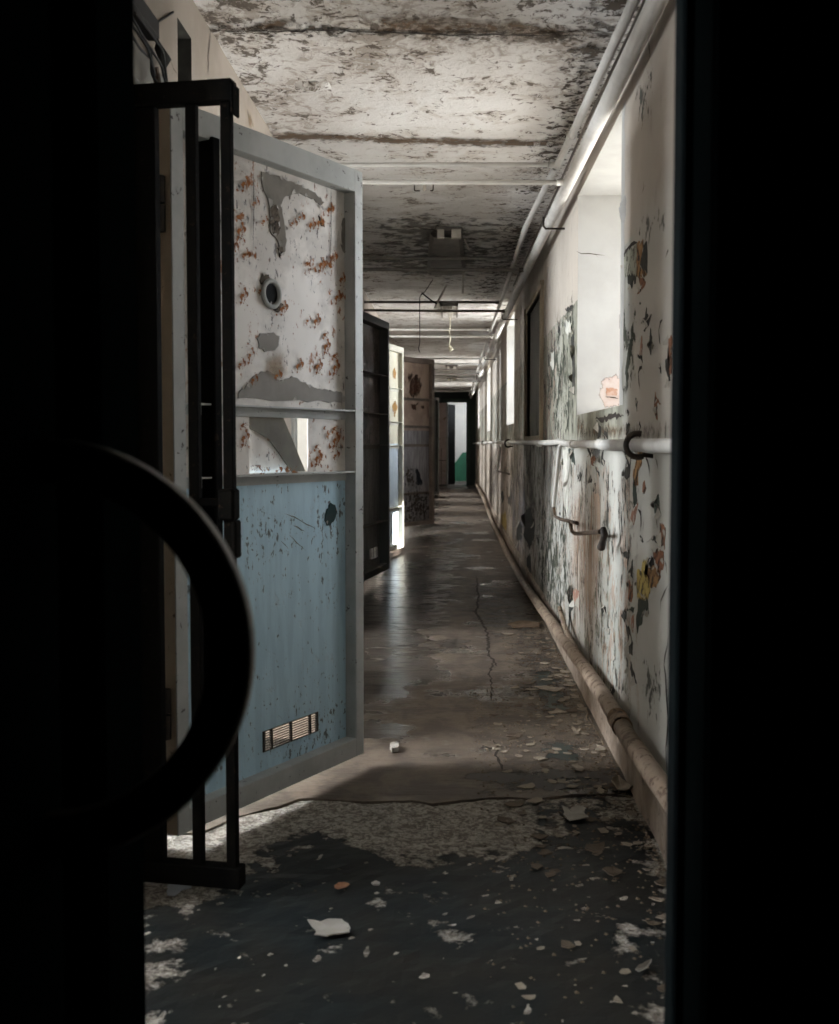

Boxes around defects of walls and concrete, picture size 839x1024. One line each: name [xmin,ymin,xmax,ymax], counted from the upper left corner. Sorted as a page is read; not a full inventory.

damp [210,0,640,299]
corrosion [234,171,268,262]
peeling [261,172,324,259]
corrosion [290,202,335,232]
corrosion [304,252,346,305]
peeling [238,370,346,403]
corrosion [270,313,340,380]
peeling [620,240,672,420]
peeling [561,420,608,518]
peeling [611,451,666,686]
crack [438,573,497,699]
crack [493,740,503,770]